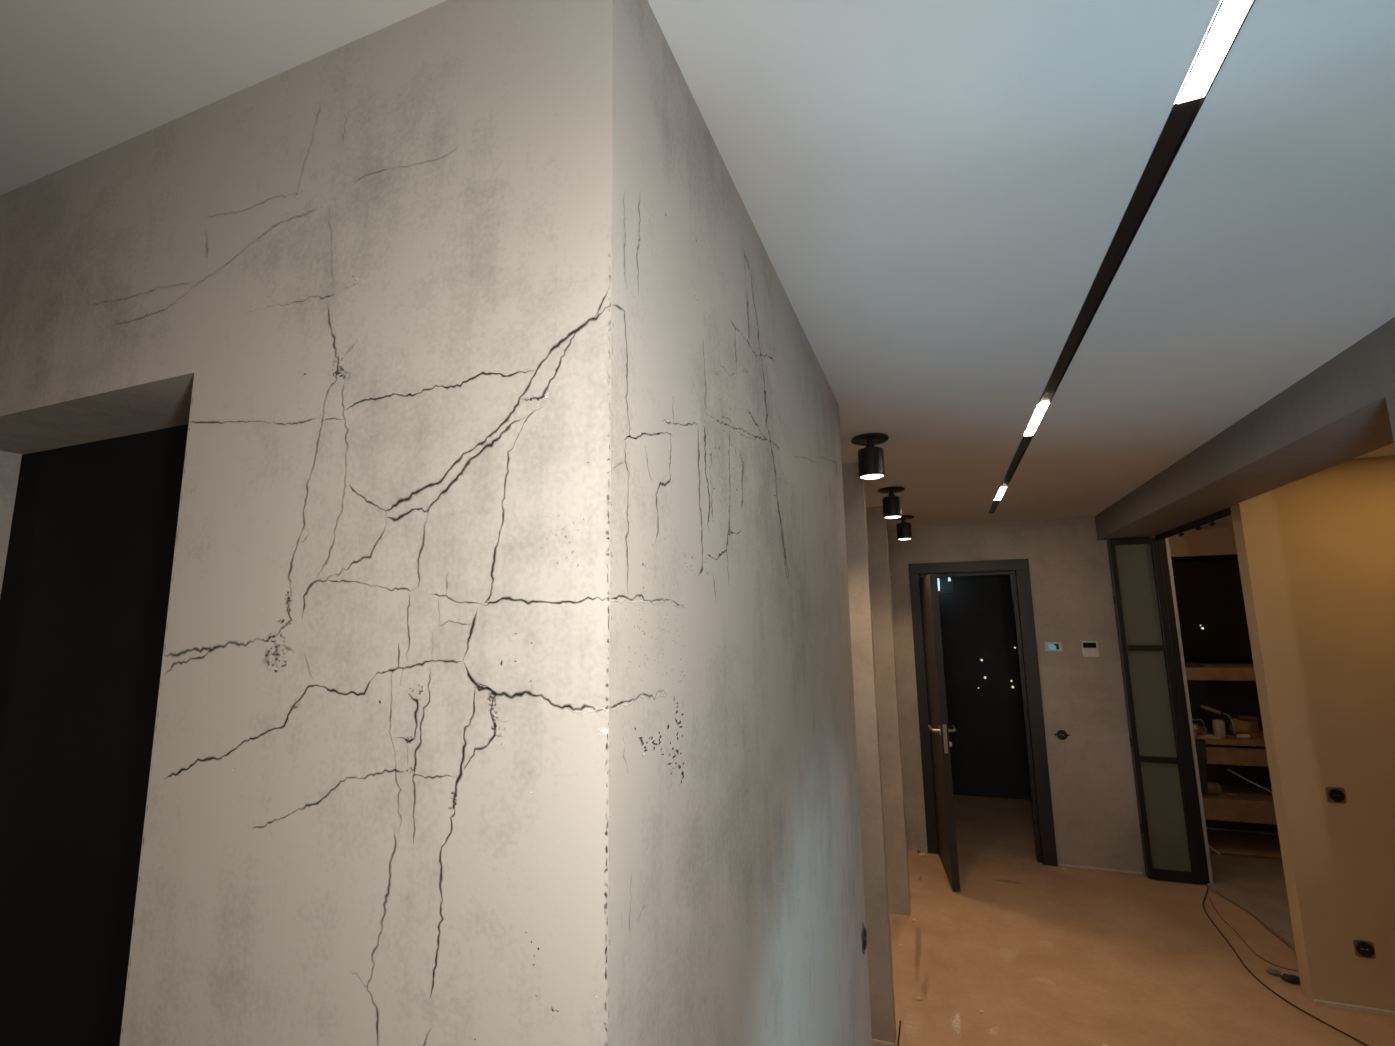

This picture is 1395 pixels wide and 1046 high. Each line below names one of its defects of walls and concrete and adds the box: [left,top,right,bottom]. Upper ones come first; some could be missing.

crack [166,256,779,1035]